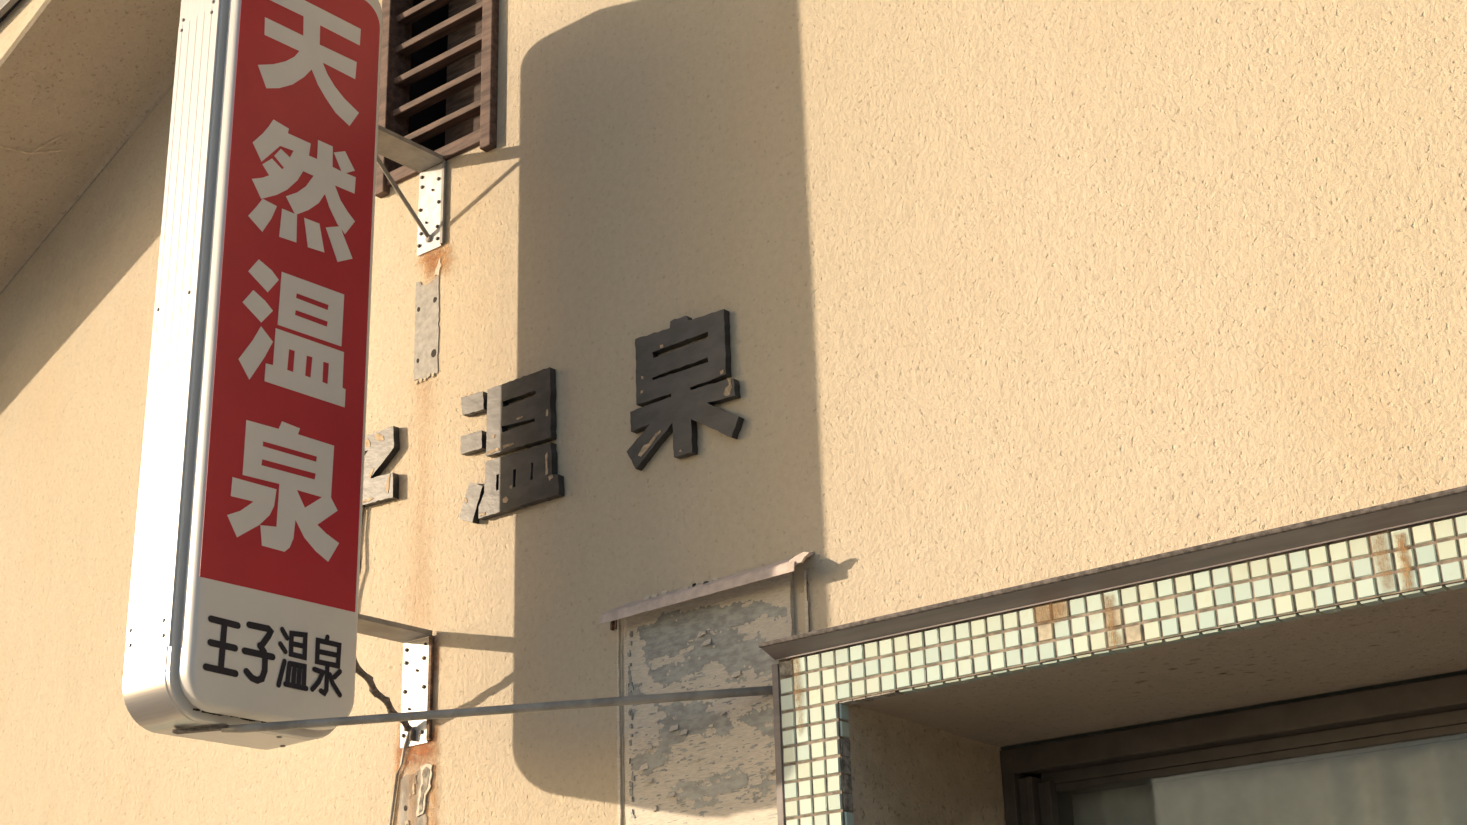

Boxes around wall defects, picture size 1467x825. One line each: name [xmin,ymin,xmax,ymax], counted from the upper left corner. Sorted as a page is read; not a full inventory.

corrosion [1373,534,1412,589]
peeling [627,599,793,825]
corrosion [396,734,435,771]